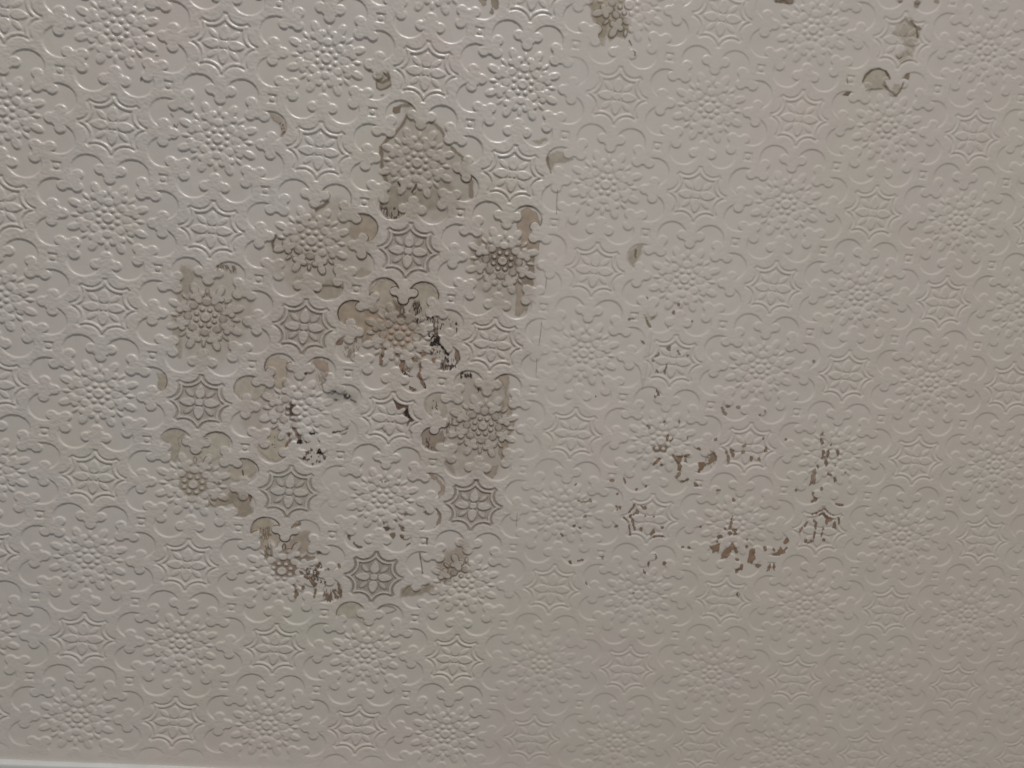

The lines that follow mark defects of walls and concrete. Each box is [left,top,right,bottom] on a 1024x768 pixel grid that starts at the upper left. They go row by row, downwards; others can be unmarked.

peeling [653,420,768,487]
peeling [608,478,664,539]
peeling [799,432,846,544]
peeling [710,515,789,573]
peeling [293,551,342,602]